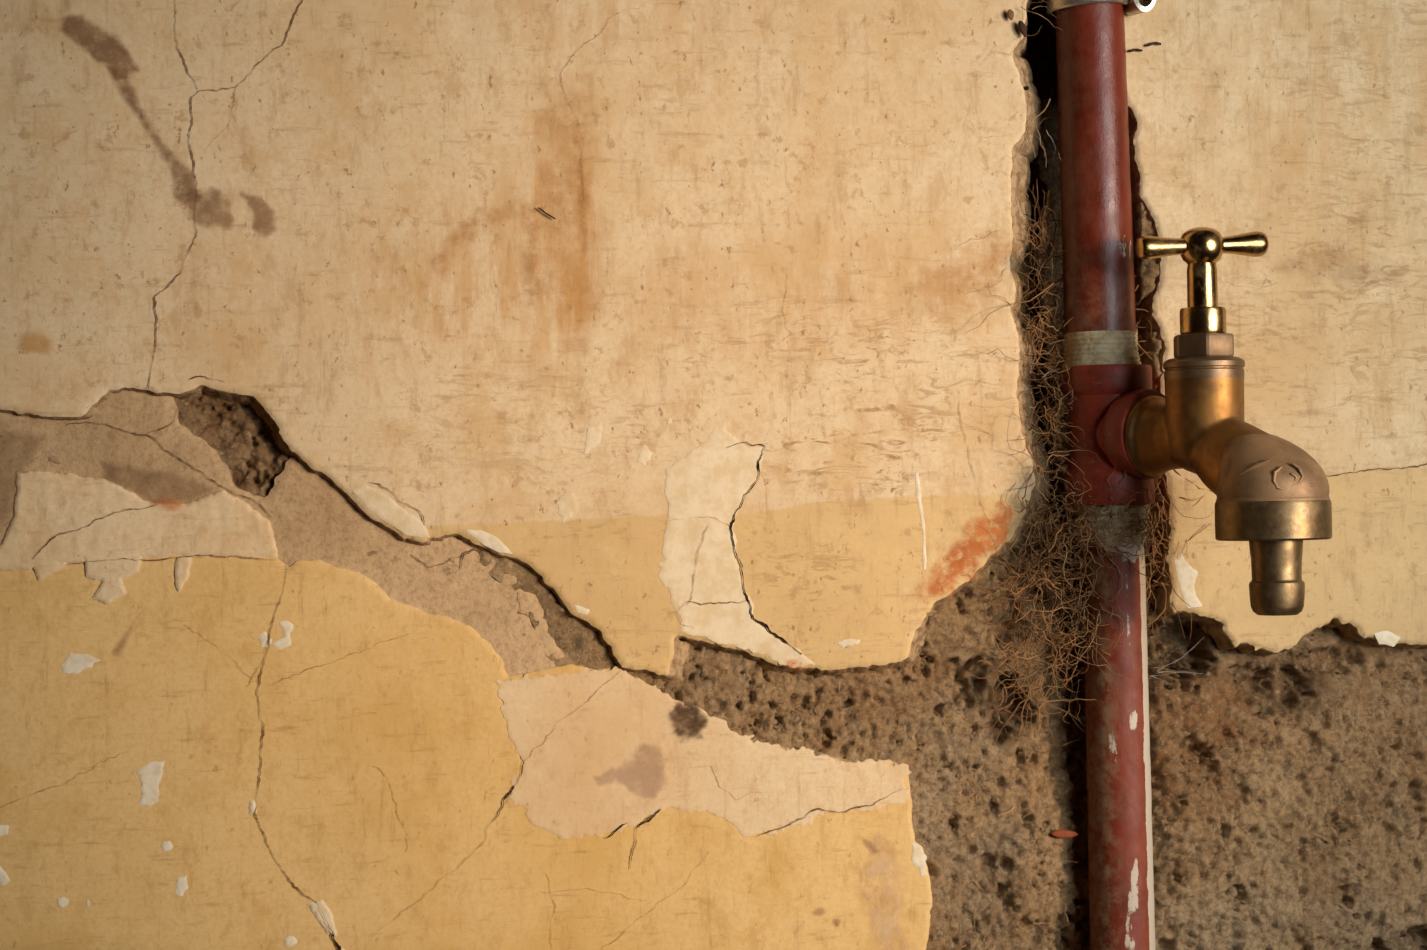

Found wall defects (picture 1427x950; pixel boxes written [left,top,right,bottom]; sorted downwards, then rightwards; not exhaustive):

water stain [64,17,232,226]
crack [175,0,303,179]
crack [148,216,198,388]
water stain [247,197,273,231]
crack [68,376,272,517]
crack [684,442,802,654]
rust [933,504,1012,592]
crack [40,505,354,950]
spalling [0,390,1090,950]
crack [591,809,660,944]
crack [759,792,895,836]
spalling [1144,475,1427,950]